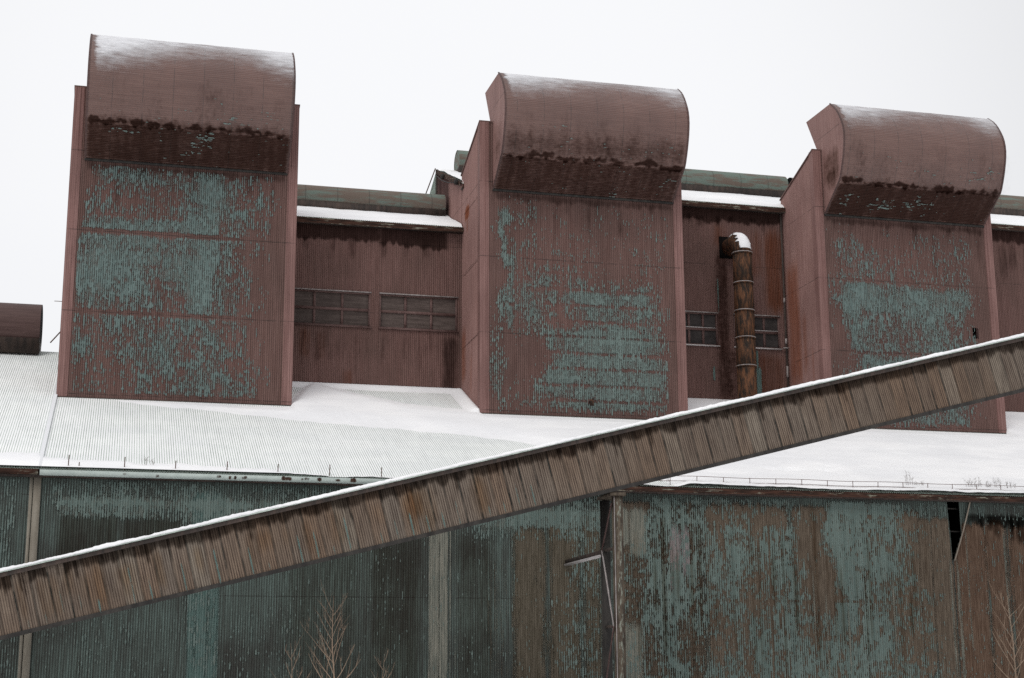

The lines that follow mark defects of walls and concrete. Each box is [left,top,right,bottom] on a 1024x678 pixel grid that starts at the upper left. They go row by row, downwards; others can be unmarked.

peeling [71,133,281,398]
peeling [489,187,671,416]
peeling [826,194,981,375]
peeling [890,402,982,428]
peeling [465,495,1023,678]